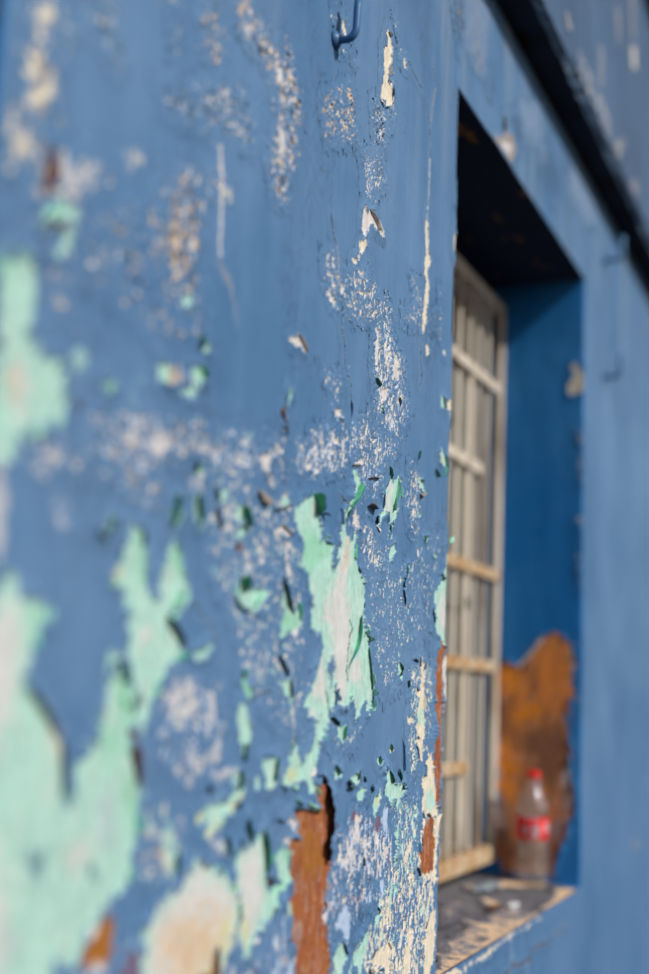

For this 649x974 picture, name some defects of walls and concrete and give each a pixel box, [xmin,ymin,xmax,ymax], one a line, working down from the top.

peeling [0,0,307,974]
peeling [328,0,350,36]
peeling [123,6,584,974]